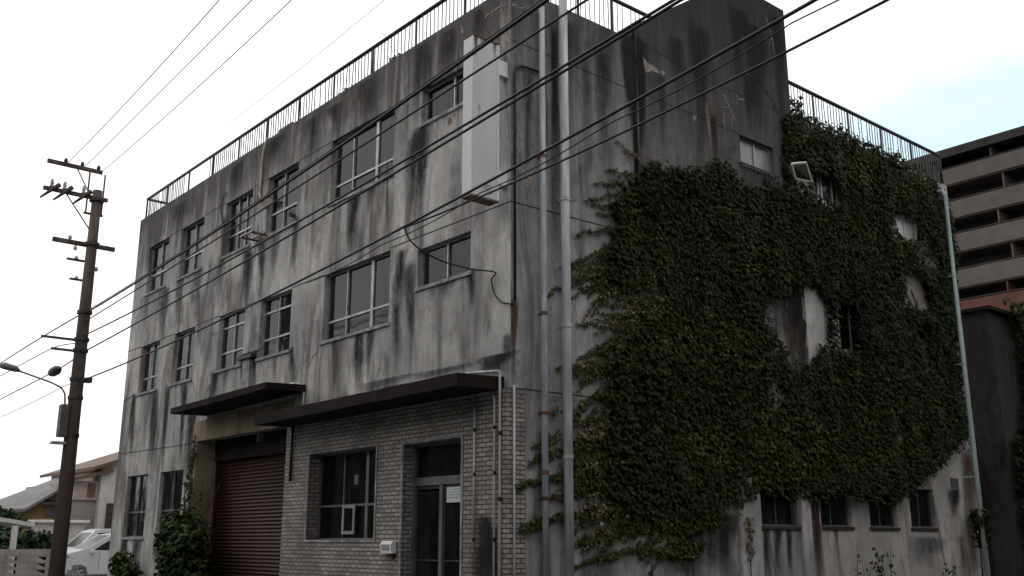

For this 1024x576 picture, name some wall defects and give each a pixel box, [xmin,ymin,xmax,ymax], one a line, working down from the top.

leakage [622,36,645,145]
spalling [643,57,666,76]
crack [705,80,778,163]
leakage [732,9,782,110]
leakage [411,127,428,207]
leakage [348,188,372,246]
leakage [244,235,275,298]
leakage [160,279,183,323]
leakage [151,384,195,464]
leakage [122,540,139,562]
leakage [764,529,791,565]